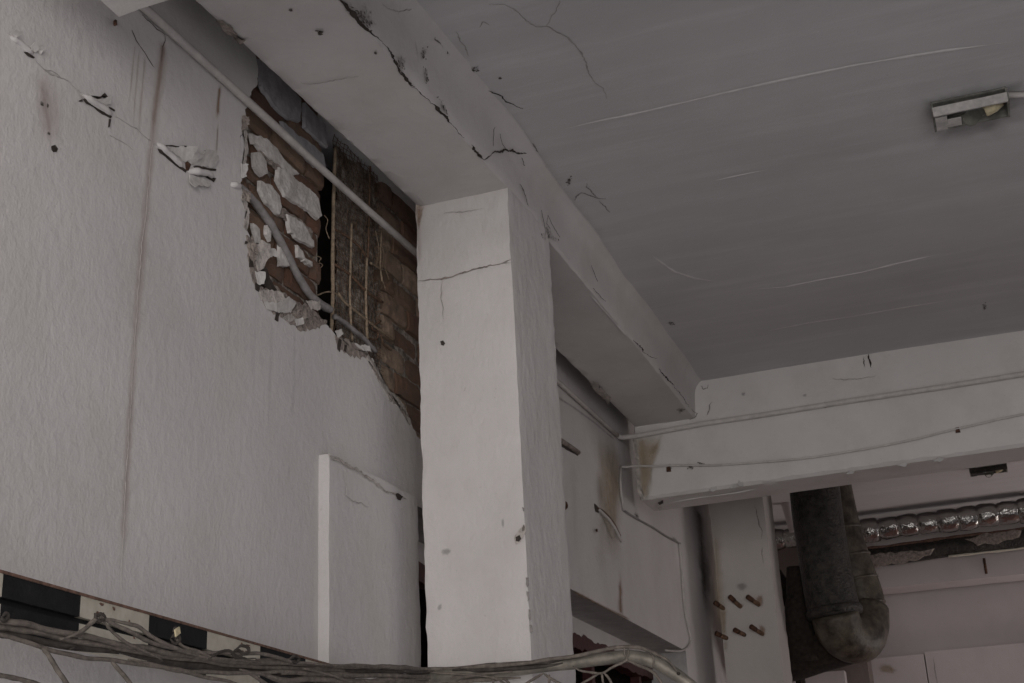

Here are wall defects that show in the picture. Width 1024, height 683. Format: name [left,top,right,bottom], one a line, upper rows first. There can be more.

crack [456,1,606,94]
spalling [79,93,115,127]
crack [340,0,560,237]
spalling [157,142,219,188]
spalling [231,56,421,439]
crack [419,259,512,306]
crack [324,452,406,511]